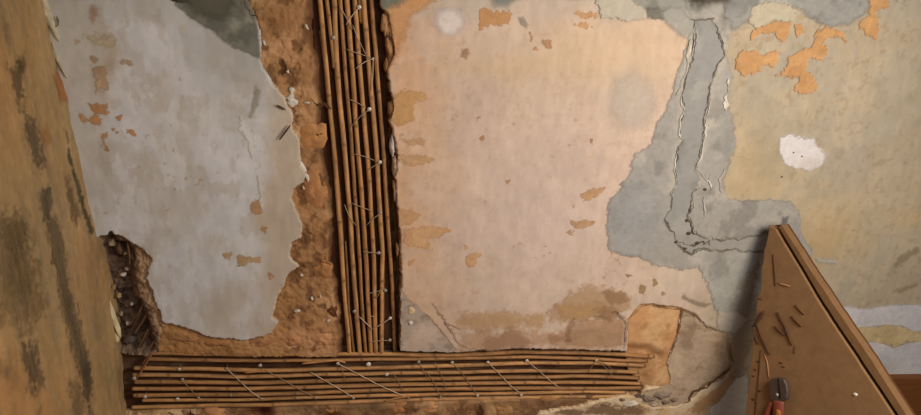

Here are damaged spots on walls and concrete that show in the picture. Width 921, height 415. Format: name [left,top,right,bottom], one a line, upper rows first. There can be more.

peeling [479,0,513,30]
peeling [574,0,694,37]
peeling [736,1,848,95]
peeling [79,55,137,152]
spalling [156,0,352,357]
spalling [381,0,451,301]
peeling [573,187,606,207]
crack [664,18,768,256]
water stain [81,351,92,399]
spalling [110,301,121,342]
spalling [126,279,748,415]
water stain [460,285,630,349]